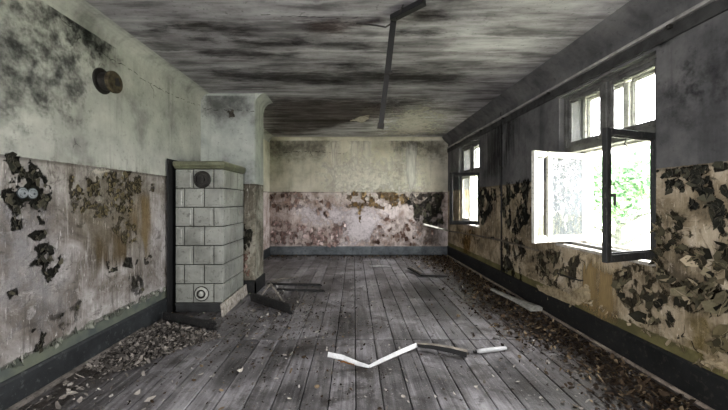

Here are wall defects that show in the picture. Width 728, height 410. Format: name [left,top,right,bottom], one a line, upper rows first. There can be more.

mould [0,33,36,65]
mould [66,17,110,55]
leakage [175,22,300,58]
leakage [307,21,347,33]
leakage [212,63,465,85]
leakage [264,99,400,133]
peeling [1,151,64,283]
peeling [68,169,155,244]
peeling [341,191,445,246]
peeling [478,178,618,318]
peeling [611,161,728,357]
peeling [75,255,166,334]